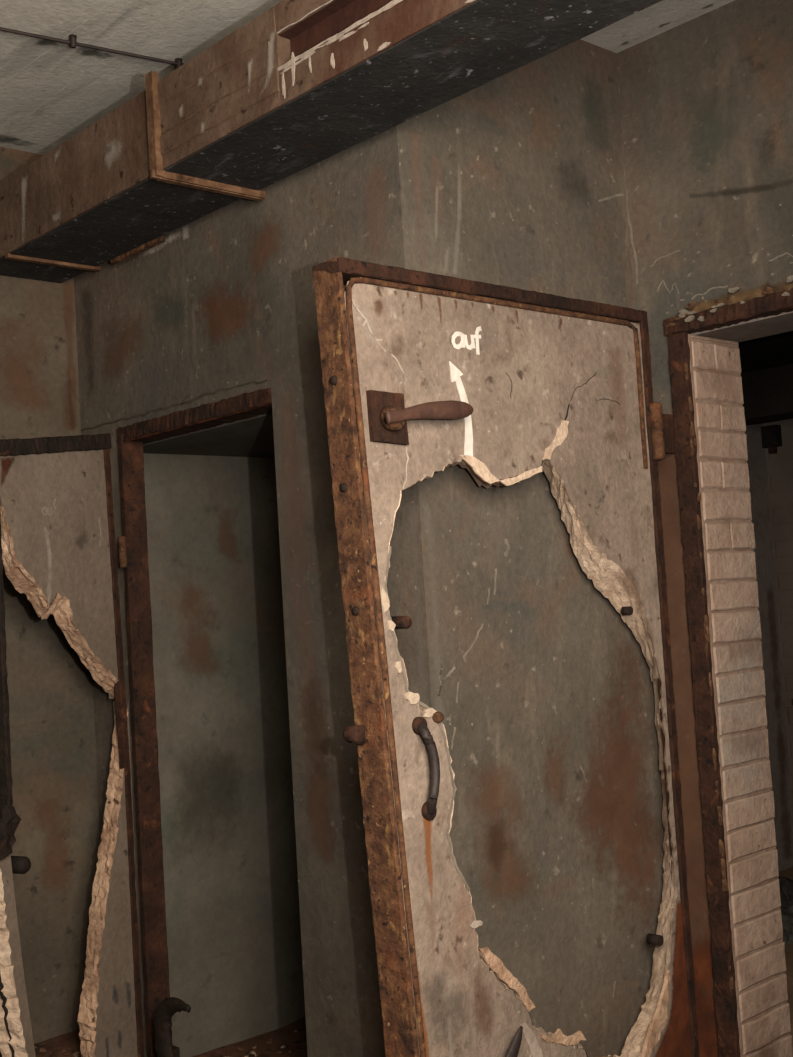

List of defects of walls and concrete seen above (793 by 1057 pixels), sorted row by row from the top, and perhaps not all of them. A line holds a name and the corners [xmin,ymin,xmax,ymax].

rust [424,818,432,883]
spalling [372,404,677,1057]
rust [656,453,719,1057]